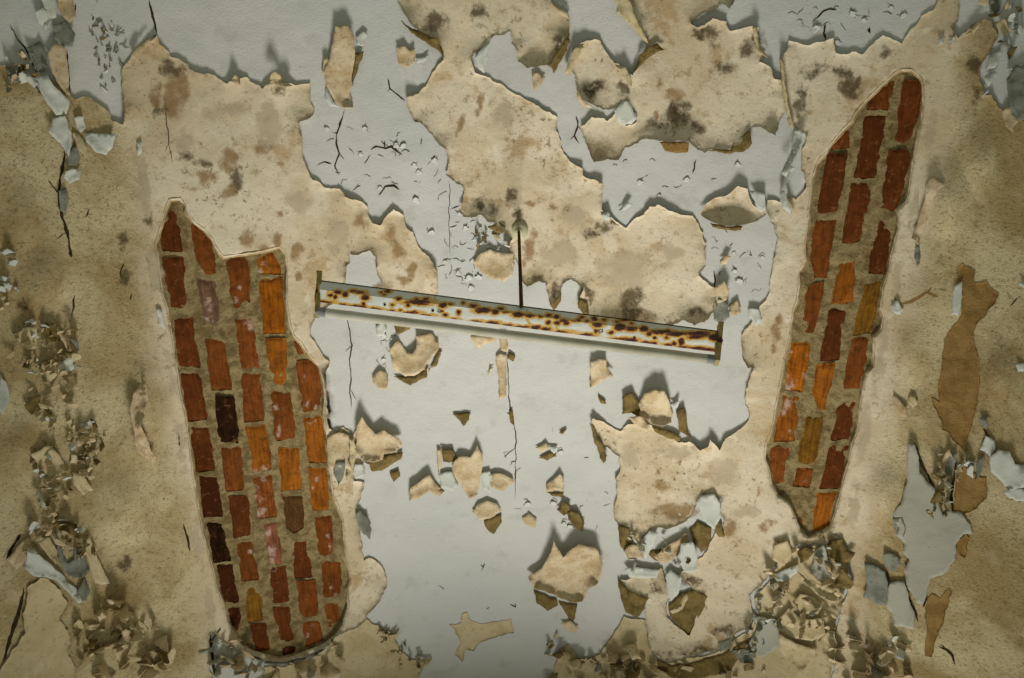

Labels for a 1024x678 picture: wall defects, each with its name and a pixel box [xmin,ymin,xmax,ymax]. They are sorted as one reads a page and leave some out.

water stain [425,12,446,30]
water stain [648,84,705,135]
crack [48,150,89,257]
crack [318,109,489,291]
peeling [0,0,442,678]
crack [346,320,356,407]
crack [503,362,608,529]
peeling [397,0,1024,678]